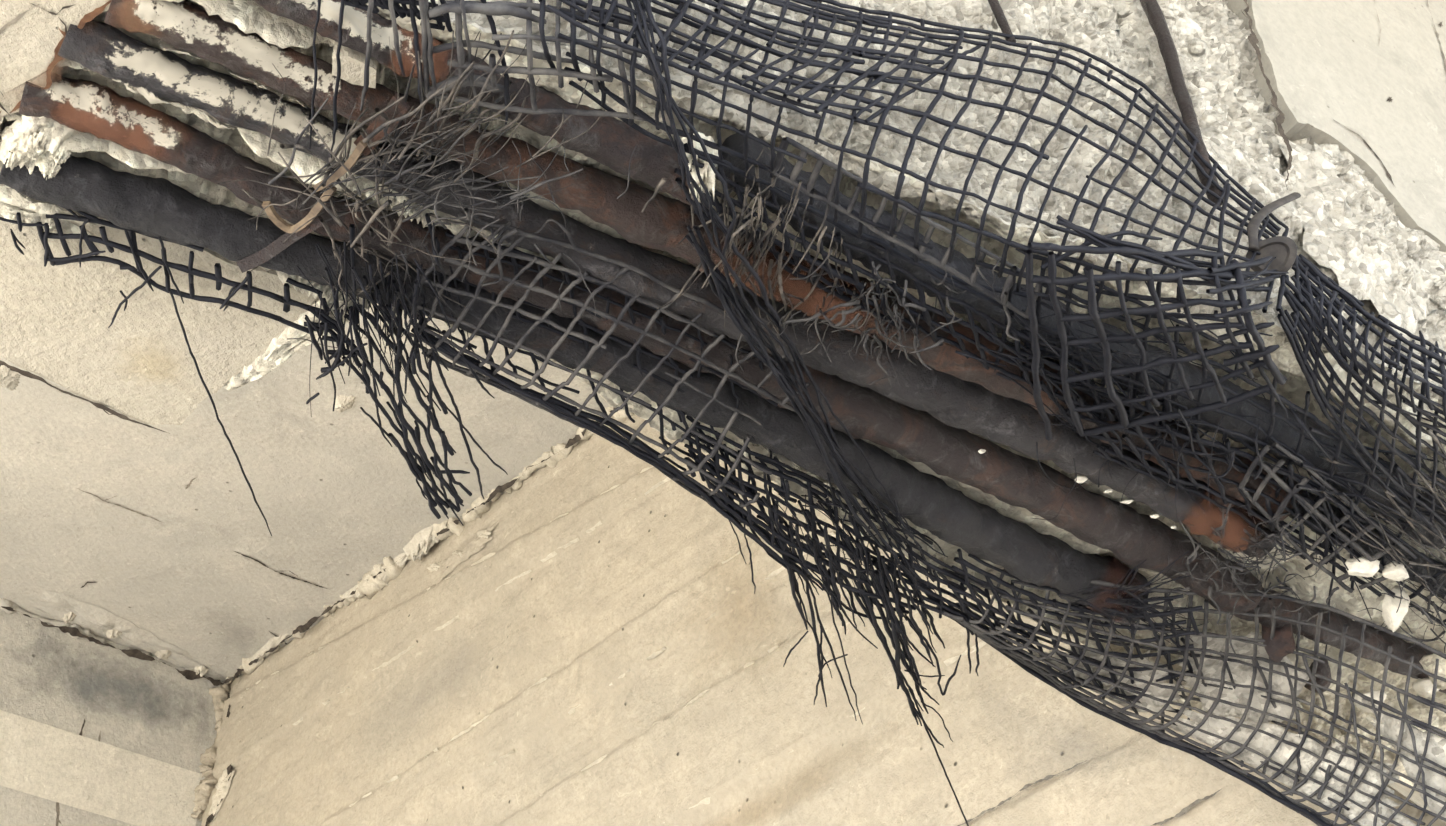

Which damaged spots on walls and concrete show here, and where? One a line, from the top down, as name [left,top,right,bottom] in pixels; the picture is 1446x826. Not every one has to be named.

crack [0,0,111,114]
corrosion [43,57,187,157]
corrosion [122,0,157,33]
spalling [161,0,335,64]
corrosion [388,28,452,84]
spalling [0,112,293,236]
corrosion [705,234,871,332]
spalling [366,0,1446,502]
crack [0,360,170,434]
crack [436,407,618,536]
spalling [522,349,1262,710]
crack [1,551,403,717]